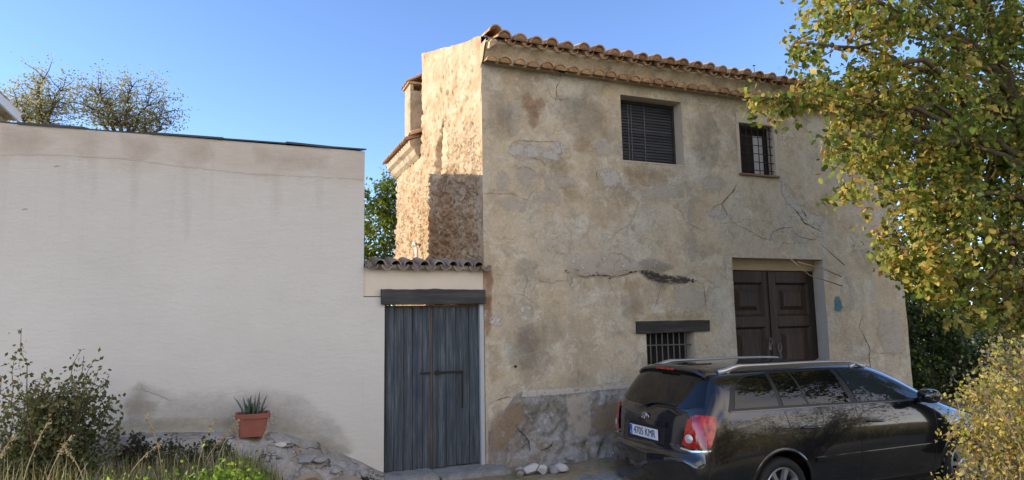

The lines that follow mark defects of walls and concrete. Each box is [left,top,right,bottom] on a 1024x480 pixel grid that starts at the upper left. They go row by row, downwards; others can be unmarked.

crack [565,191,639,288]
crack [676,186,820,240]
spalling [491,404,522,452]
spalling [567,394,591,437]